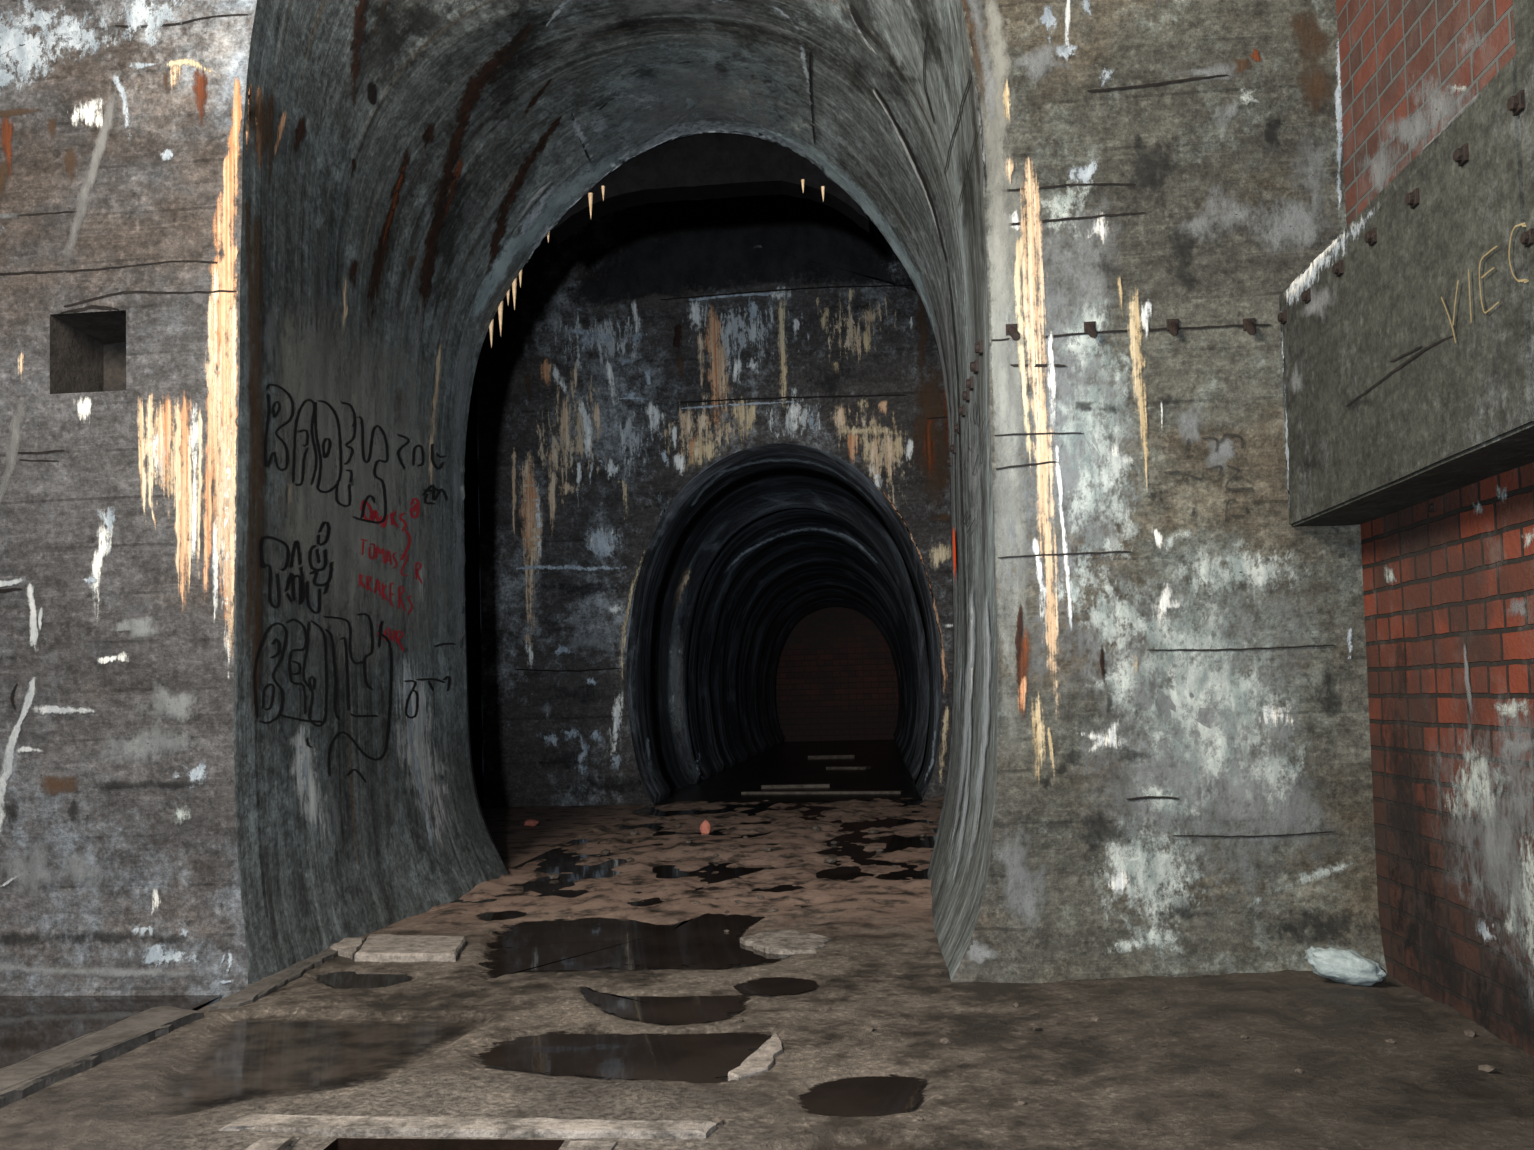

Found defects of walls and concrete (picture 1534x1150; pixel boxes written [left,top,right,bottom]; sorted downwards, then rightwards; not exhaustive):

leakage [0,0,184,90]
corrosion [350,0,389,106]
corrosion [525,79,551,114]
leakage [66,63,154,254]
corrosion [342,24,534,339]
corrosion [487,116,562,275]
leakage [1171,39,1373,509]
corrosion [1015,605,1028,711]
efflorescence [968,945,994,962]
leakage [1273,863,1351,889]
leakage [1279,910,1378,942]